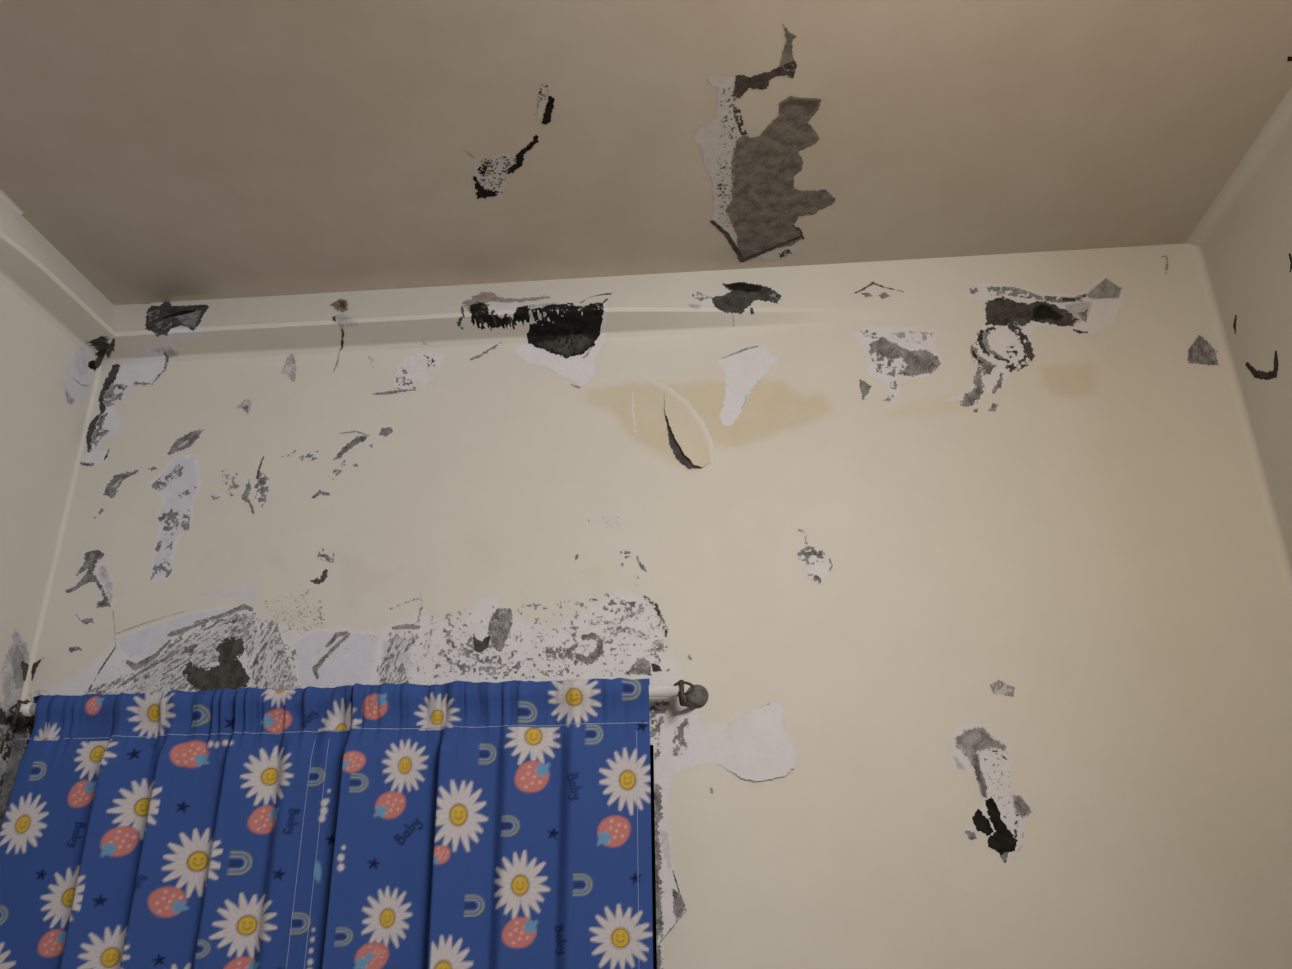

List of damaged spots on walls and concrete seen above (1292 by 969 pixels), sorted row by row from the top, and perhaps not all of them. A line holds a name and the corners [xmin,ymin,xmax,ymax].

peeling [465,83,555,199]
peeling [692,24,836,263]
peeling [58,298,395,583]
peeling [372,348,446,396]
flaking render [457,290,612,389]
water stain [580,374,842,483]
flaking render [686,281,784,327]
peeling [852,324,945,405]
peeling [945,276,1125,413]
peeling [0,547,798,969]
peeling [946,720,1036,865]